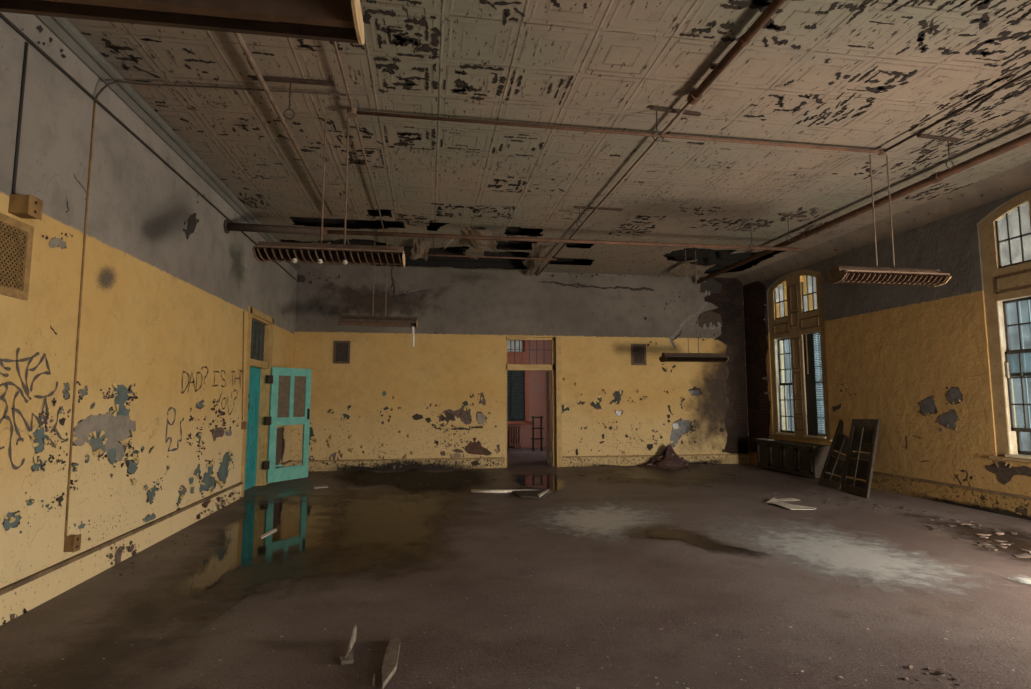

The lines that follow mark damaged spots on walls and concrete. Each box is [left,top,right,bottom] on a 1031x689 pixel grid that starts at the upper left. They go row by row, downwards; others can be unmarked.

peeling [297,0,525,101]
peeling [680,0,803,50]
peeling [743,66,918,127]
peeling [804,0,1031,182]
peeling [2,381,154,534]
spalling [302,392,500,470]
water stain [337,460,485,530]
peeling [562,386,700,456]
water stain [689,336,738,440]
peeling [918,387,963,432]
water stain [149,498,448,621]
water stain [535,503,966,591]